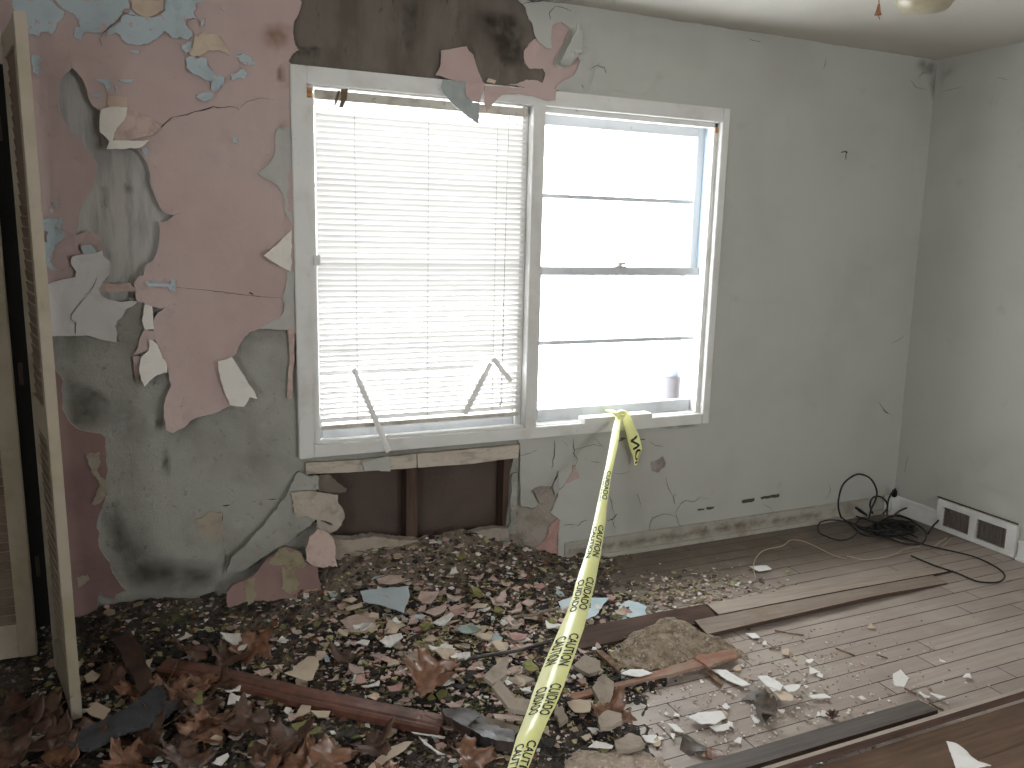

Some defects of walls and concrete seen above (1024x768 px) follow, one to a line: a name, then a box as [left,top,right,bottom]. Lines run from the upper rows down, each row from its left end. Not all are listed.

peeling [12,0,255,102]
crack [161,98,275,128]
flaking render [289,0,583,124]
flaking render [43,68,313,606]
flaking render [507,465,580,556]
crack [521,438,707,530]